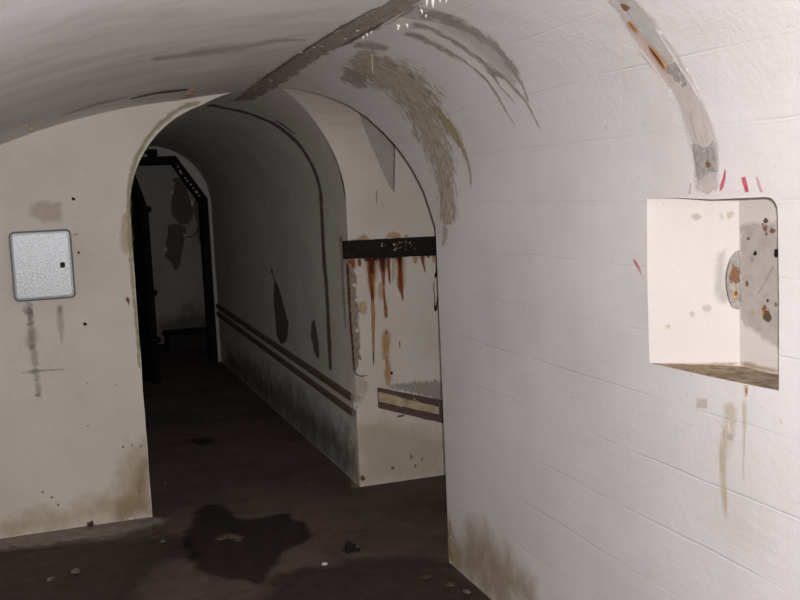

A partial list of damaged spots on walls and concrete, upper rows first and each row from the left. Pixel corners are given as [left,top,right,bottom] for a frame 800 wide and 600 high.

peeling [610,0,718,193]
spalling [346,260,367,406]
corrosion [349,257,403,384]
spalling [725,251,741,310]